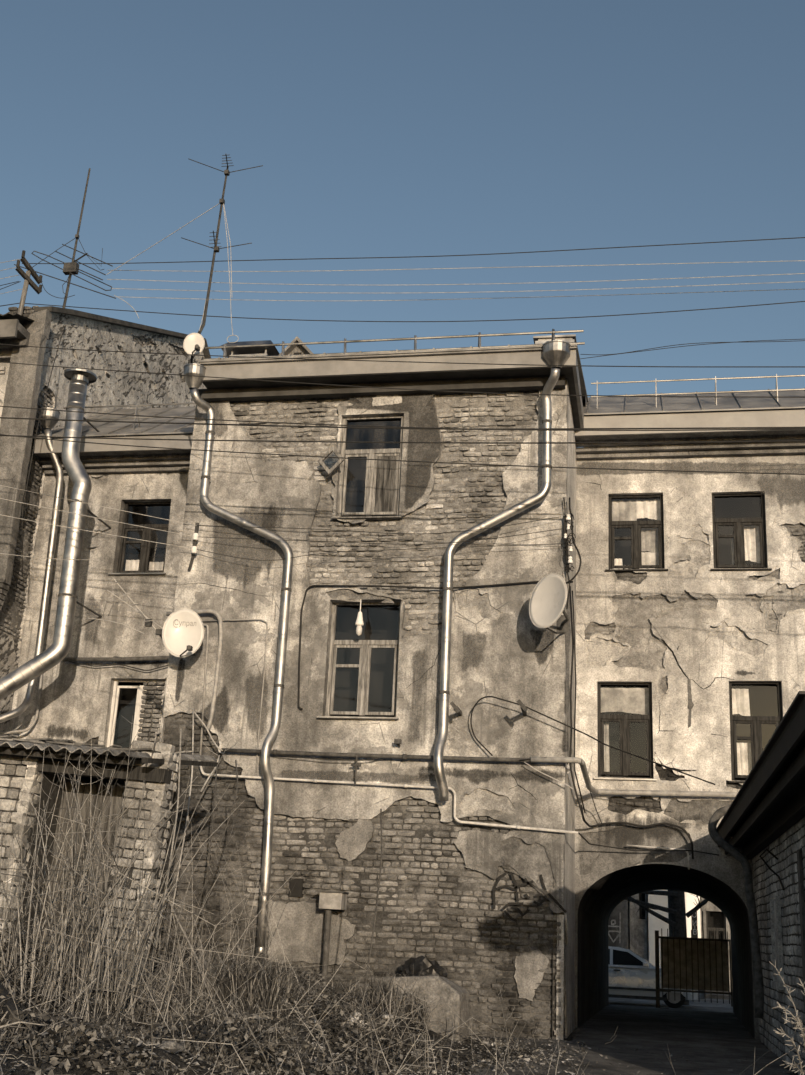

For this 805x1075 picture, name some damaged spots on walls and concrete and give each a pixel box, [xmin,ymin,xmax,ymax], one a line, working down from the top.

flaking render [230,390,542,638]
peeling [584,571,718,700]
peeling [667,524,711,578]
peeling [704,569,805,657]
spalling [779,521,805,563]
flaking render [154,713,568,1039]